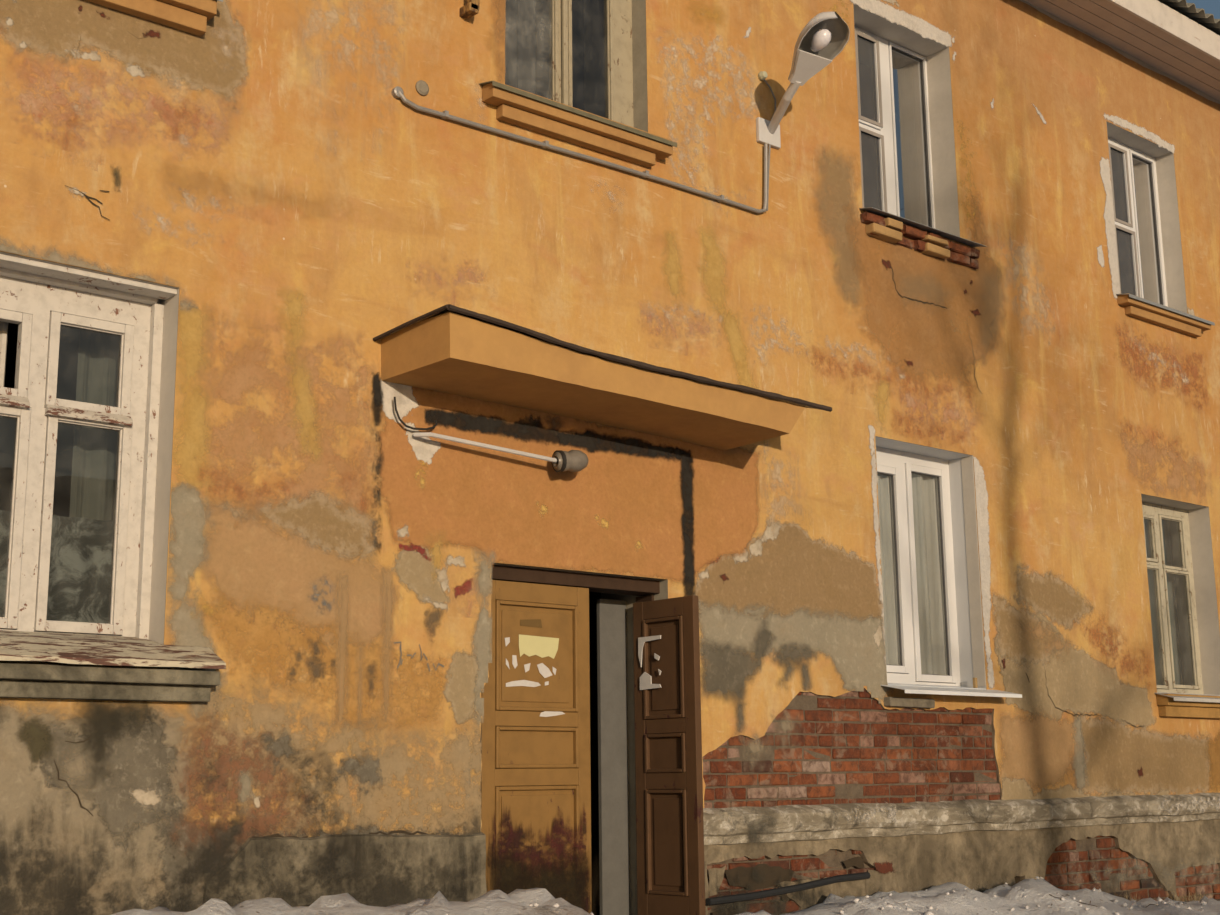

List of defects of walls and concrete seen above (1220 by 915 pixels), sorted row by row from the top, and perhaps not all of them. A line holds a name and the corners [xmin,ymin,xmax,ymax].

flaking render [0,0,248,101]
flaking render [168,483,466,657]
flaking render [694,519,883,646]
water stain [19,719,52,762]
flaking render [702,595,1220,819]
water stain [0,819,478,915]
flaking render [1044,836,1220,901]